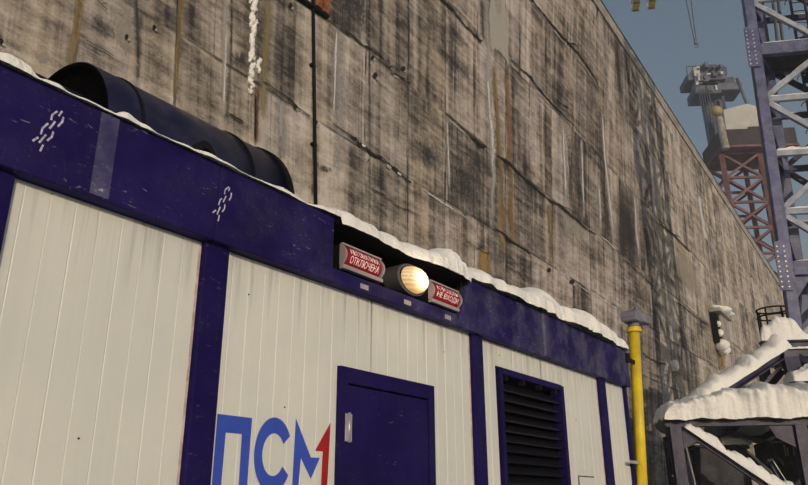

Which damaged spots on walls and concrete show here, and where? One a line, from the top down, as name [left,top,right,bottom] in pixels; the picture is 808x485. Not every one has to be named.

rust [68,0,83,62]
water stain [332,31,348,163]
water stain [446,119,468,187]
rust [492,73,514,250]